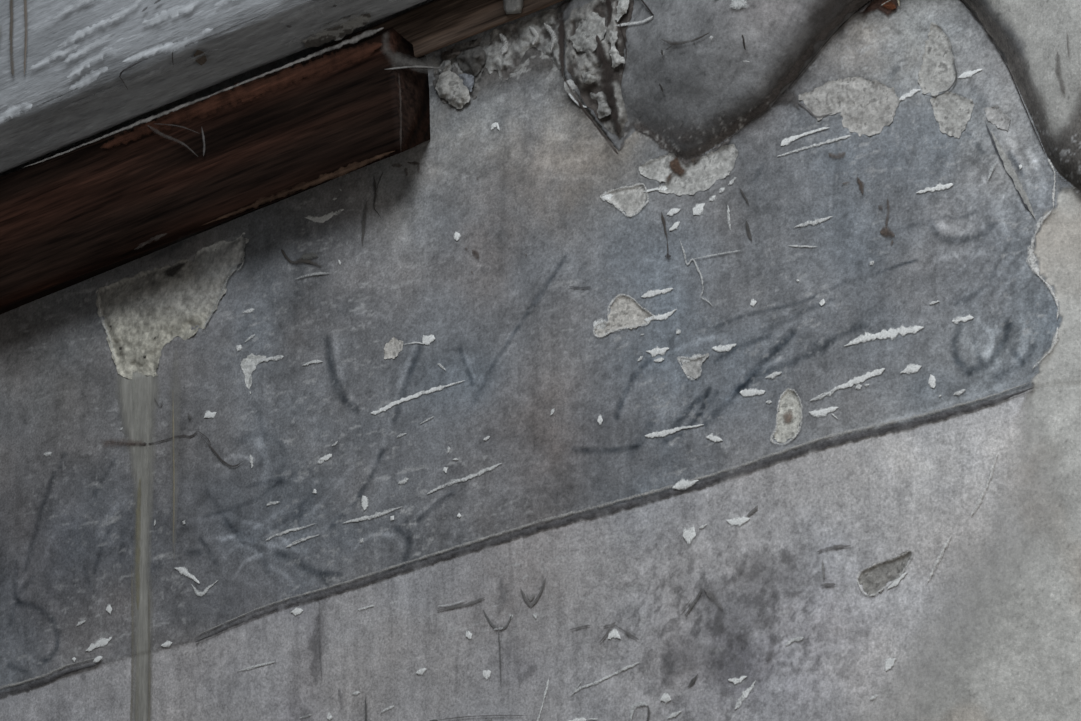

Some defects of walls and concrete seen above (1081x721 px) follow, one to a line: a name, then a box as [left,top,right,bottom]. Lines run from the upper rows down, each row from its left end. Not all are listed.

rust [860,0,900,15]
spalling [431,0,653,154]
spalling [798,76,902,136]
spalling [917,22,1010,138]
spalling [600,144,738,231]
spalling [593,294,654,337]
crack [106,413,243,467]
spalling [740,388,802,445]
peeling [901,159,1081,721]
peeling [673,479,699,490]
water stain [118,371,158,721]
spalling [856,550,913,596]